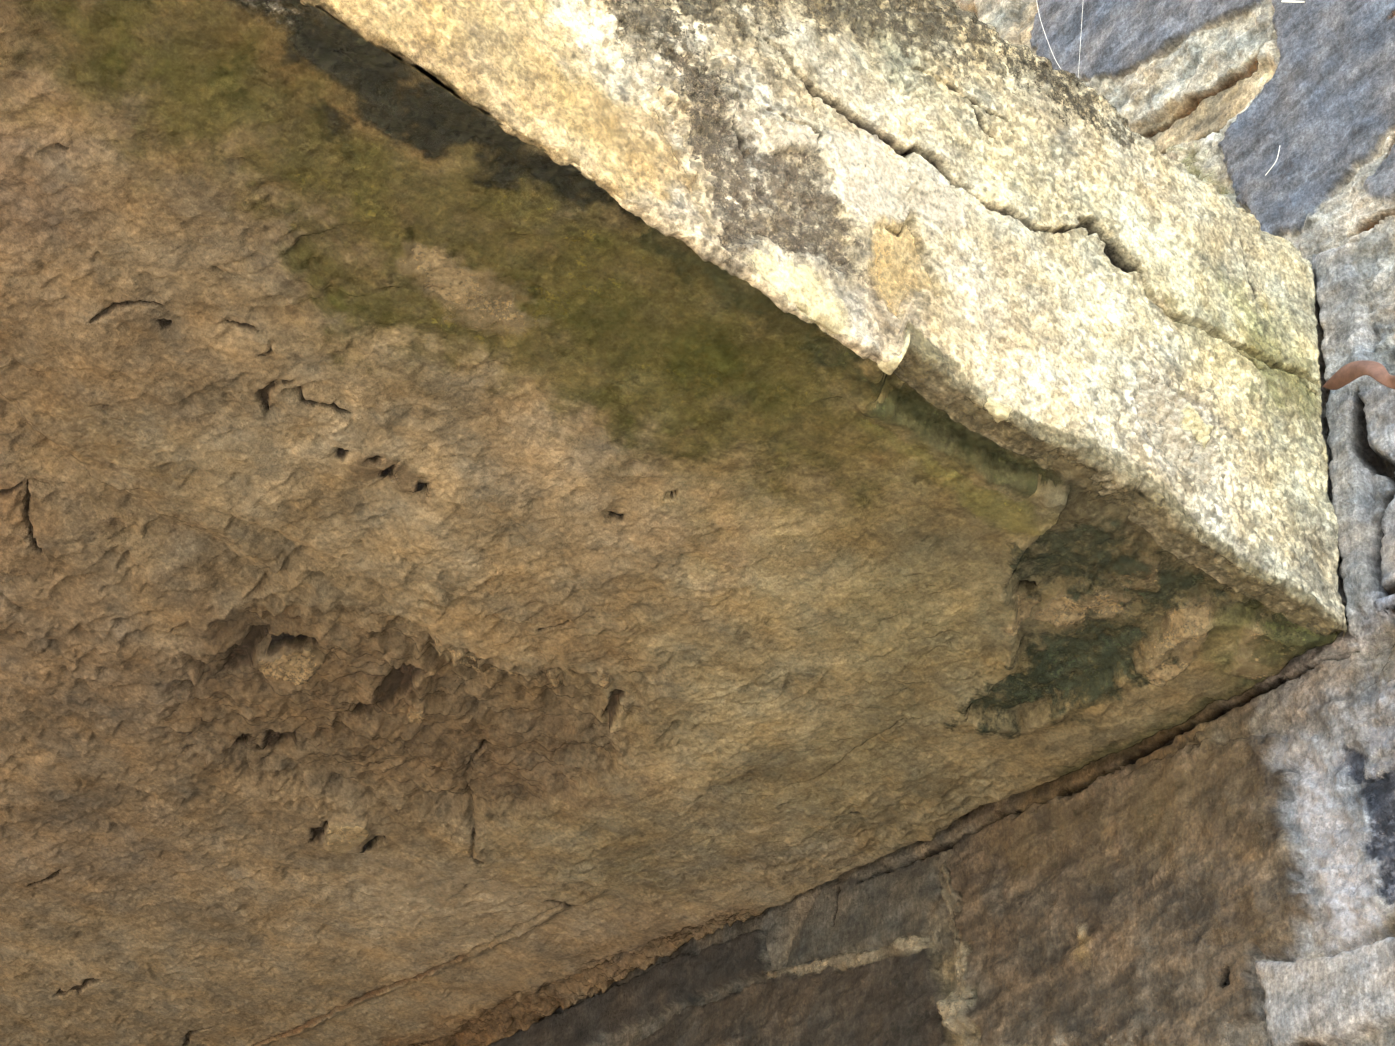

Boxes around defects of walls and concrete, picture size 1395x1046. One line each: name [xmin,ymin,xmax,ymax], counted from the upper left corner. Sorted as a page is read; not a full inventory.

crack [804,84,957,188]
damp [608,0,1155,155]
crack [946,85,1007,138]
crack [988,208,1134,273]